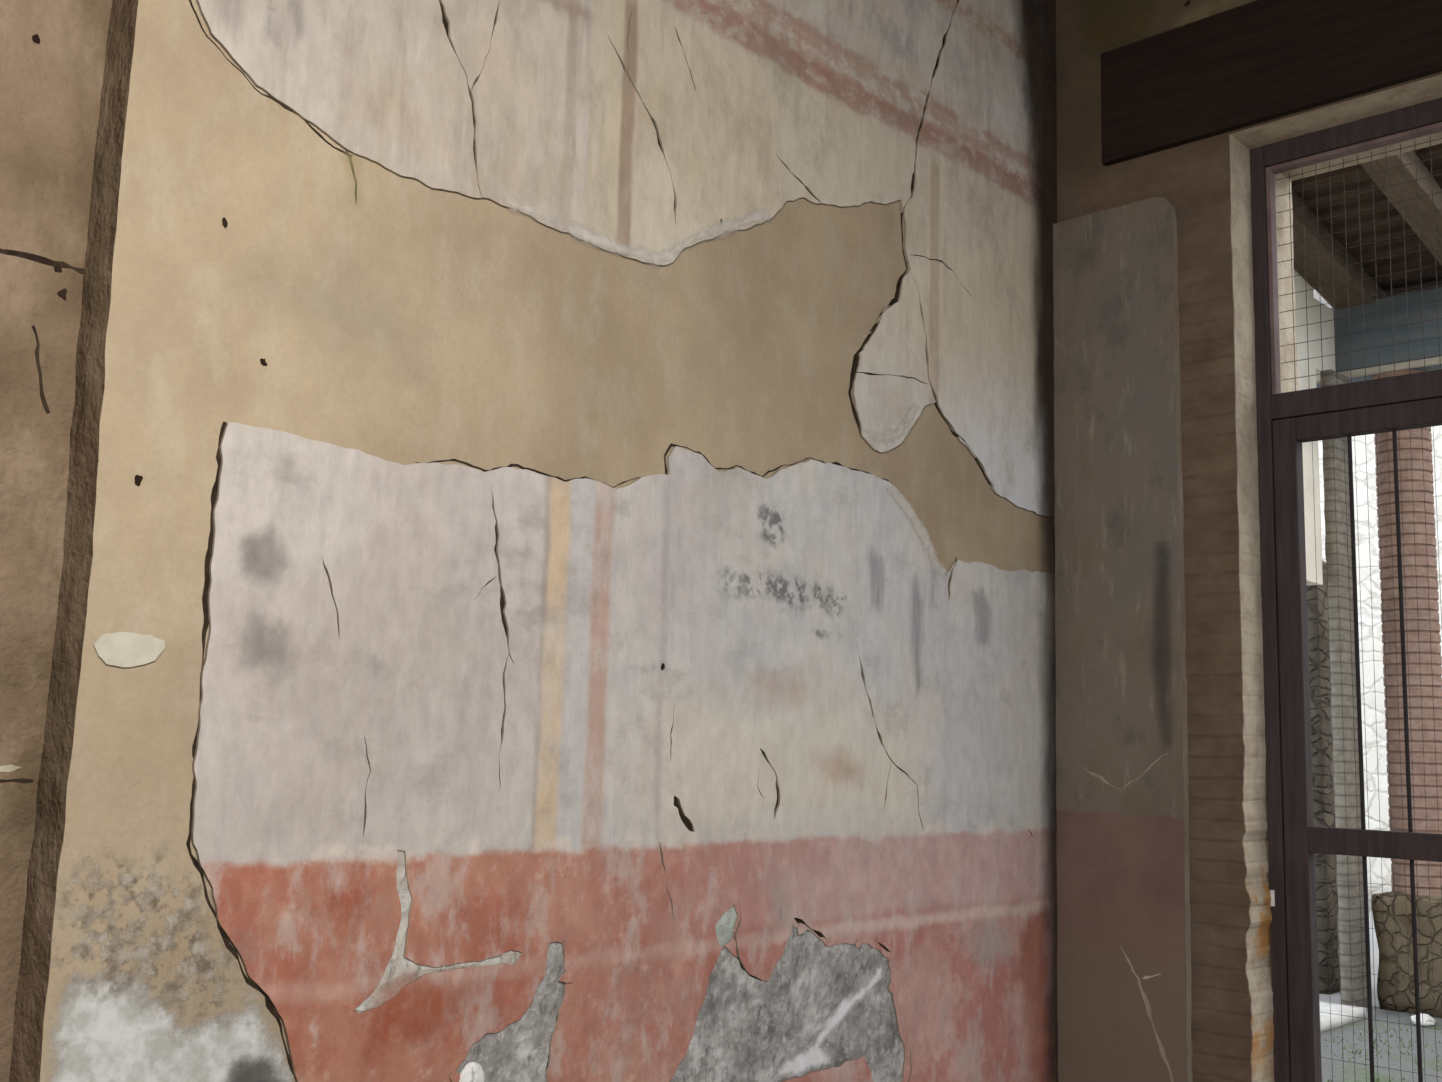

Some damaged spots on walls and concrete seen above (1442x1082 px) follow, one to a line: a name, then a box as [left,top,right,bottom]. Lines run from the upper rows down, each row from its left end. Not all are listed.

crack [0,248,84,274]
peeling [507,196,769,263]
crack [415,0,991,488]
crack [489,505,507,637]
damp [52,865,293,1082]
flaking render [354,850,521,1013]
flaking render [449,942,575,1082]
flaking render [669,905,904,1082]